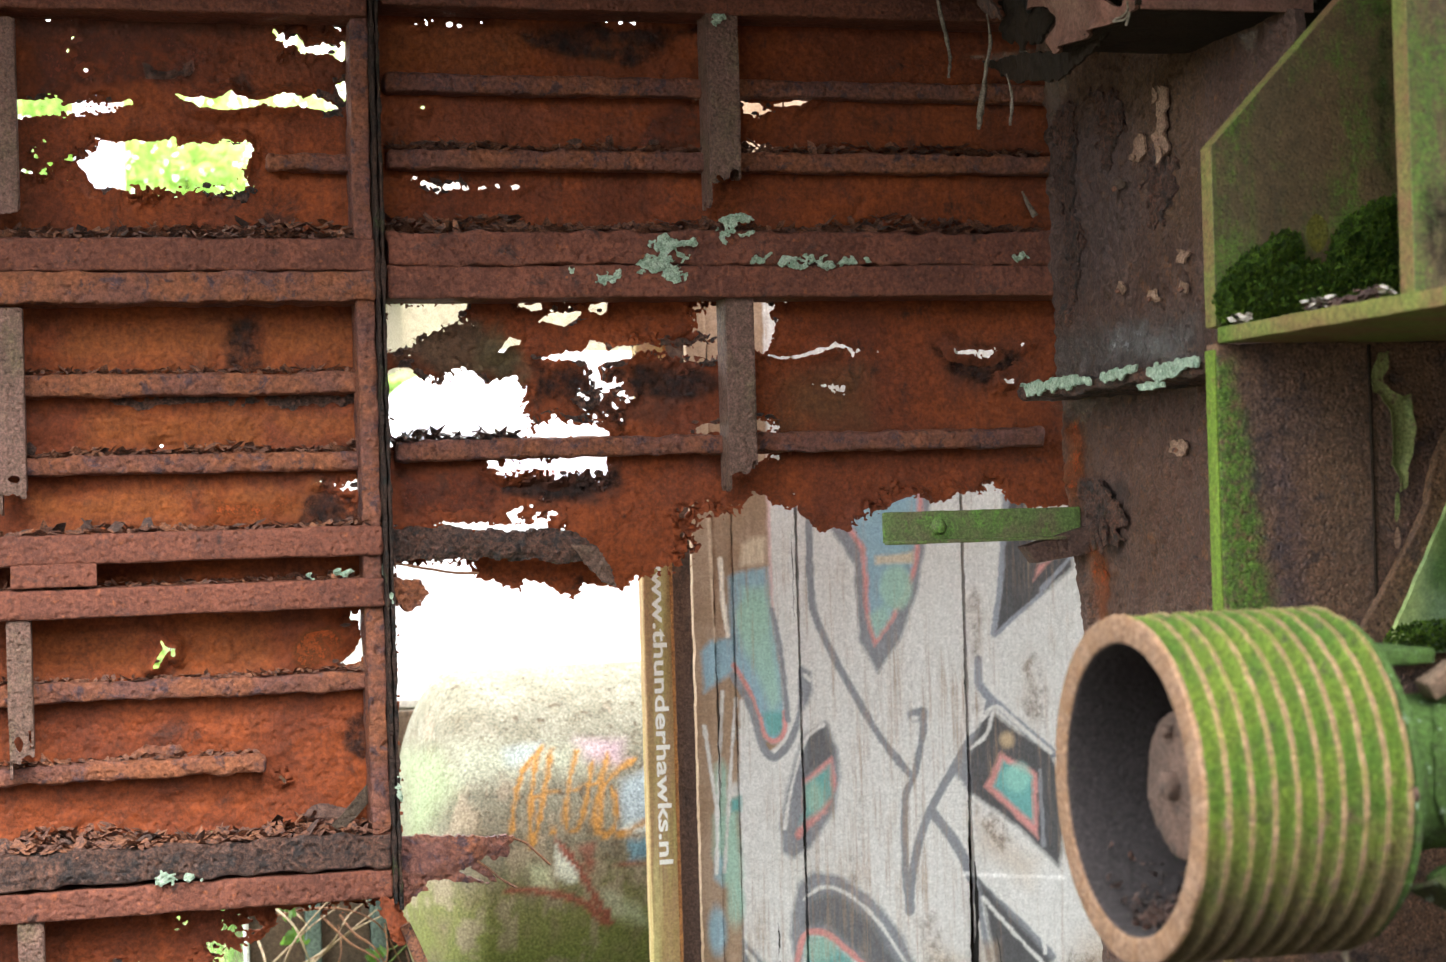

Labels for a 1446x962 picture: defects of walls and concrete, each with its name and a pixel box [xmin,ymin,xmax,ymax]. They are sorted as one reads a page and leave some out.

peeling [294,74,346,108]
peeling [1129,85,1171,166]
peeling [202,182,231,200]
peeling [1176,249,1191,264]
peeling [1146,281,1189,302]
peeling [387,334,445,384]
peeling [684,336,718,368]
peeling [571,360,626,401]
rust [669,563,684,962]